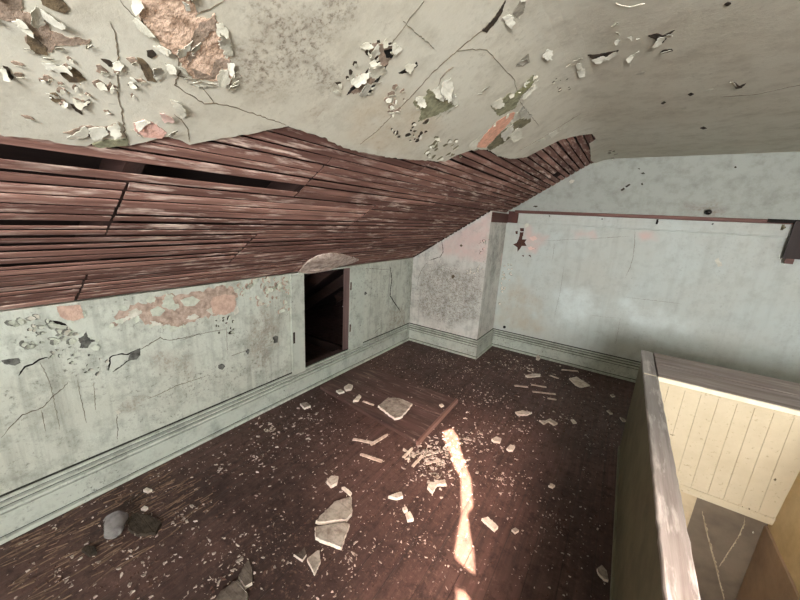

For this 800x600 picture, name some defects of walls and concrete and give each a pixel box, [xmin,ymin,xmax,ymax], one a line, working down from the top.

crack [110,23,127,139]
flaking render [0,0,241,115]
peeling [63,100,187,148]
crack [156,37,282,124]
peeling [333,38,402,97]
peeling [384,67,462,161]
crack [362,0,538,143]
flaking render [469,75,538,151]
peeling [1,305,108,376]
flaking render [109,275,291,334]
leakage [385,211,492,333]
crack [1,367,96,438]